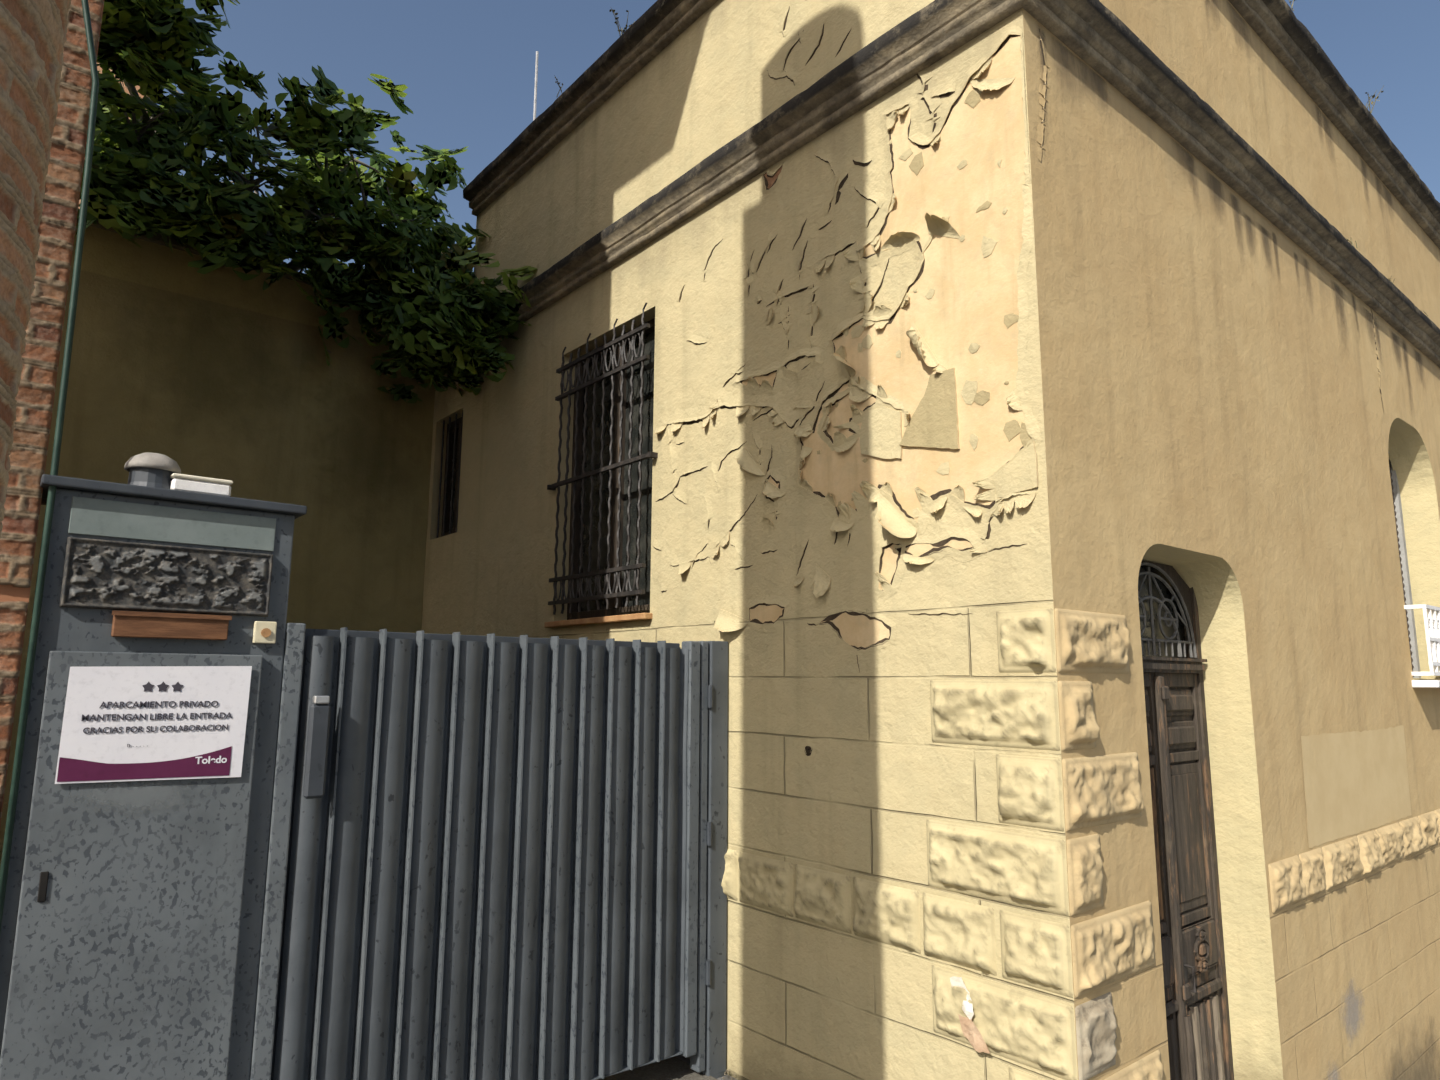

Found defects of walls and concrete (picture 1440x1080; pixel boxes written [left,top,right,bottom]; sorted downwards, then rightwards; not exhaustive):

damp [1210,175,1276,247]
peeling [702,25,1043,655]
peeling [654,422,683,434]
peeling [677,561,691,575]